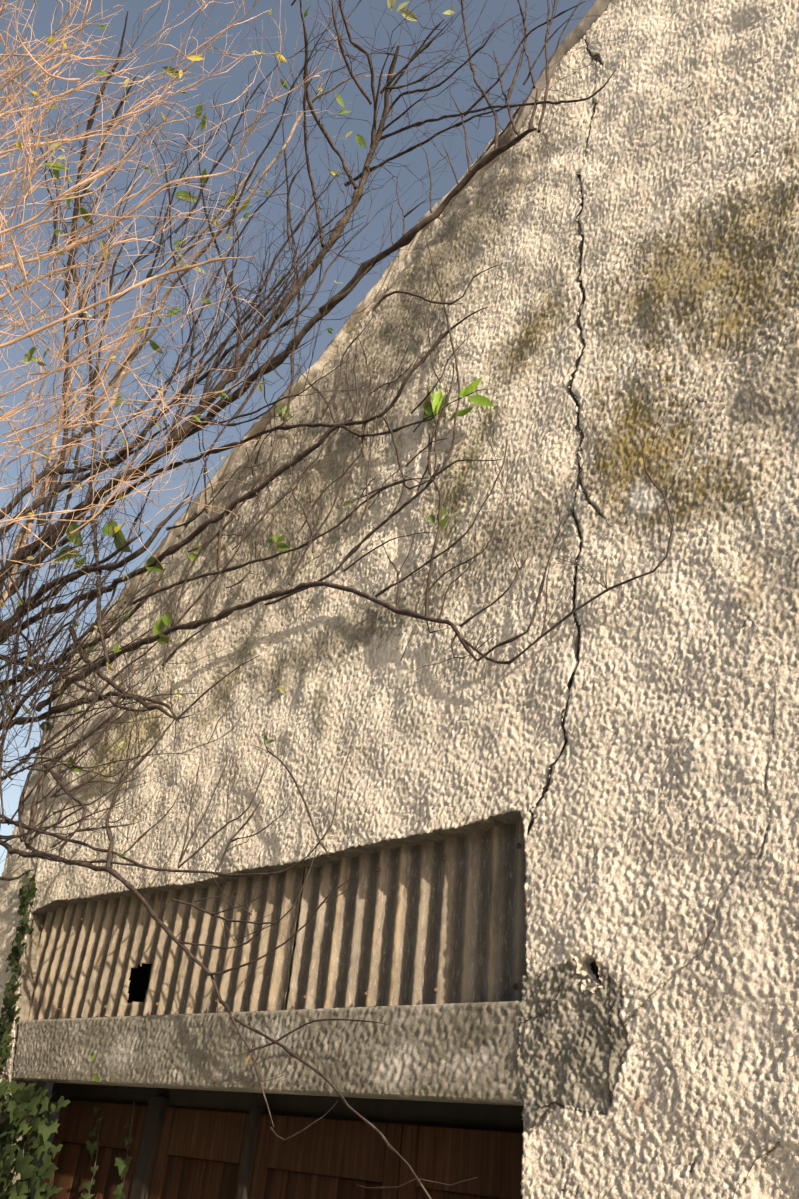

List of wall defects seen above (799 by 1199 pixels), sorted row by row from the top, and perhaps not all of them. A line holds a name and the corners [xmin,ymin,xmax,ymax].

damp [206,139,545,597]
crack [527,39,612,834]
damp [628,478,660,514]
damp [667,310,698,370]
crack [621,663,778,1026]
spalling [515,948,629,1134]
crack [730,1141,780,1199]